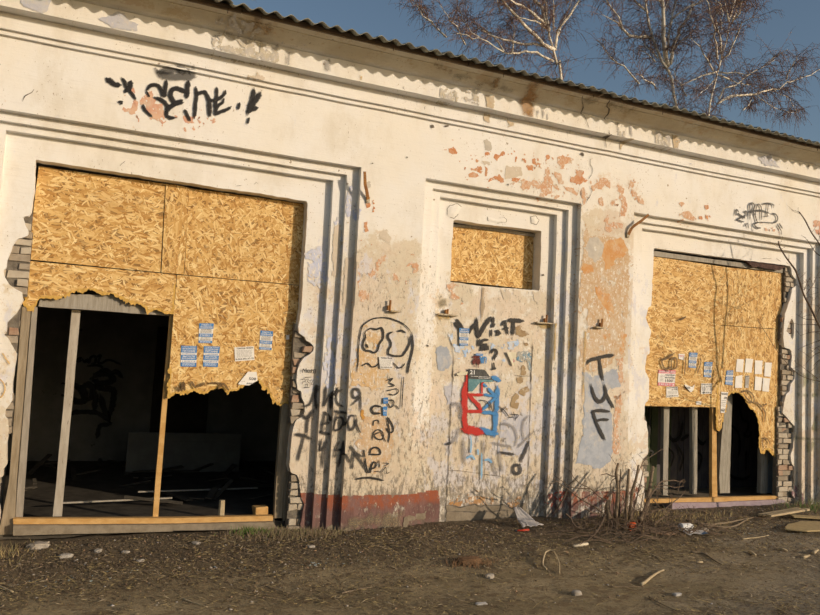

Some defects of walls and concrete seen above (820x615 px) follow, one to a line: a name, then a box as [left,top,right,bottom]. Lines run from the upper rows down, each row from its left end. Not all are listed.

peeling [99,11,138,31]
peeling [677,202,710,227]
flaking render [4,213,33,353]
peeling [444,139,644,460]
flaking render [782,266,795,303]
flaking render [5,393,15,434]
flaking render [772,315,805,504]
flaking render [285,471,304,529]